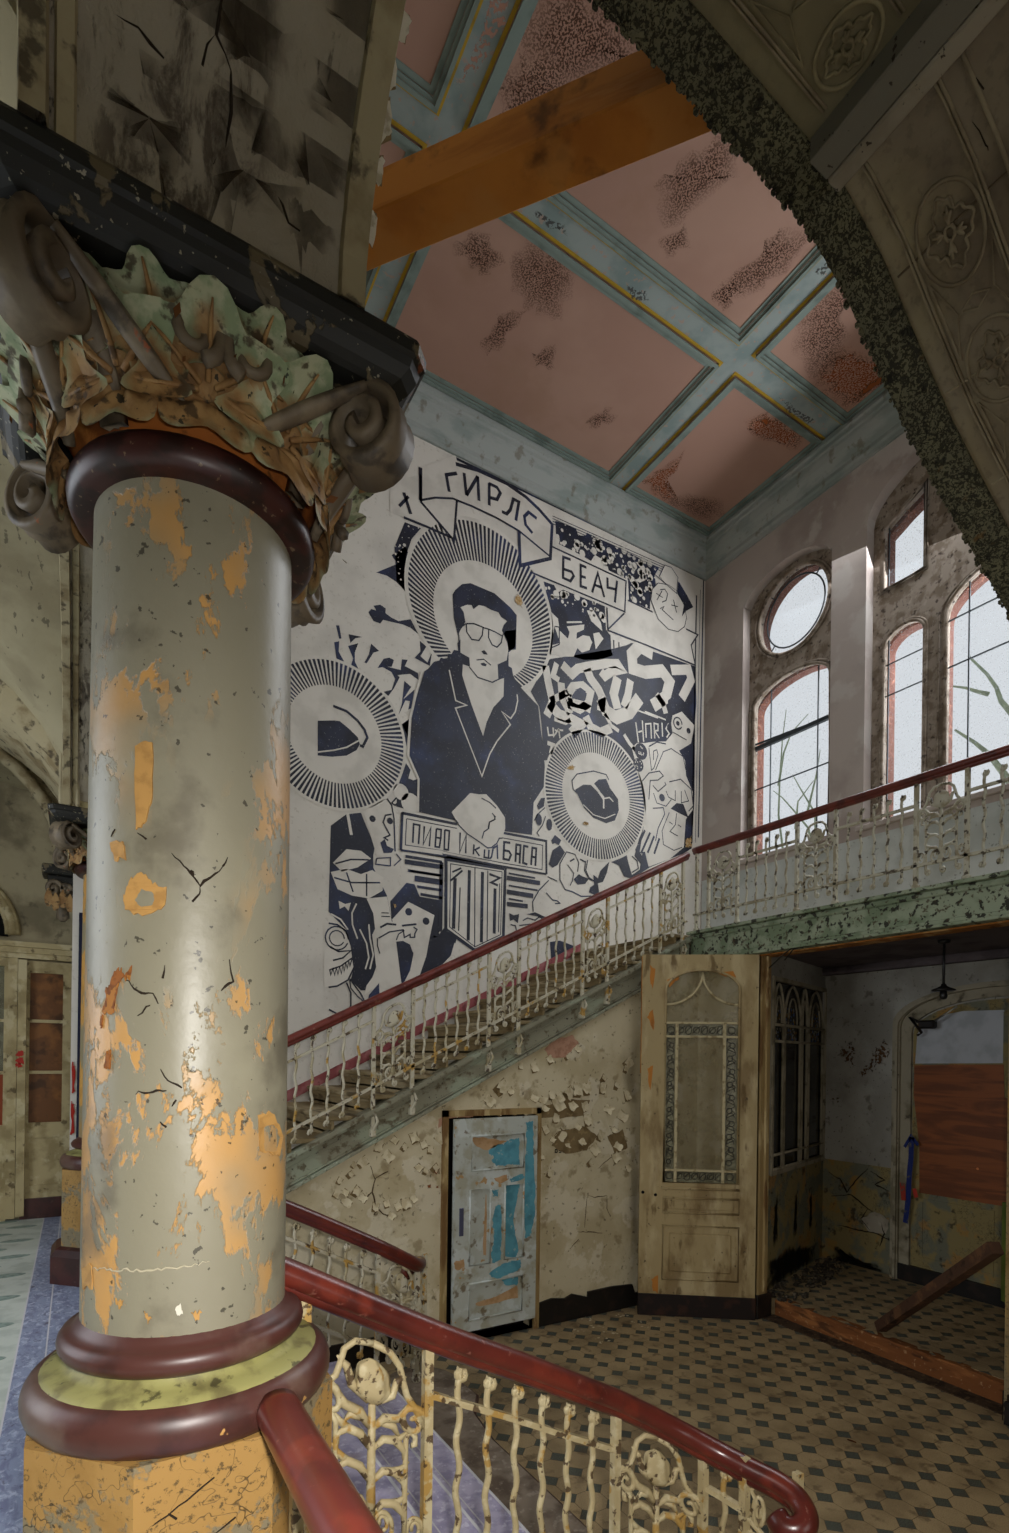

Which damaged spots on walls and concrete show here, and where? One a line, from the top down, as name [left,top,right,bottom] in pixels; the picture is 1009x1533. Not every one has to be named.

crack [117,15,164,59]
crack [201,0,233,164]
crack [278,197,300,232]
peeling [587,0,1009,621]
peeling [110,741,167,916]
crack [110,829,228,902]
peeling [100,965,132,1028]
crack [126,965,165,1016]
crack [221,959,234,991]
peeling [483,1035,653,1179]
peeling [331,1116,473,1220]
spalling [153,1477,215,1526]